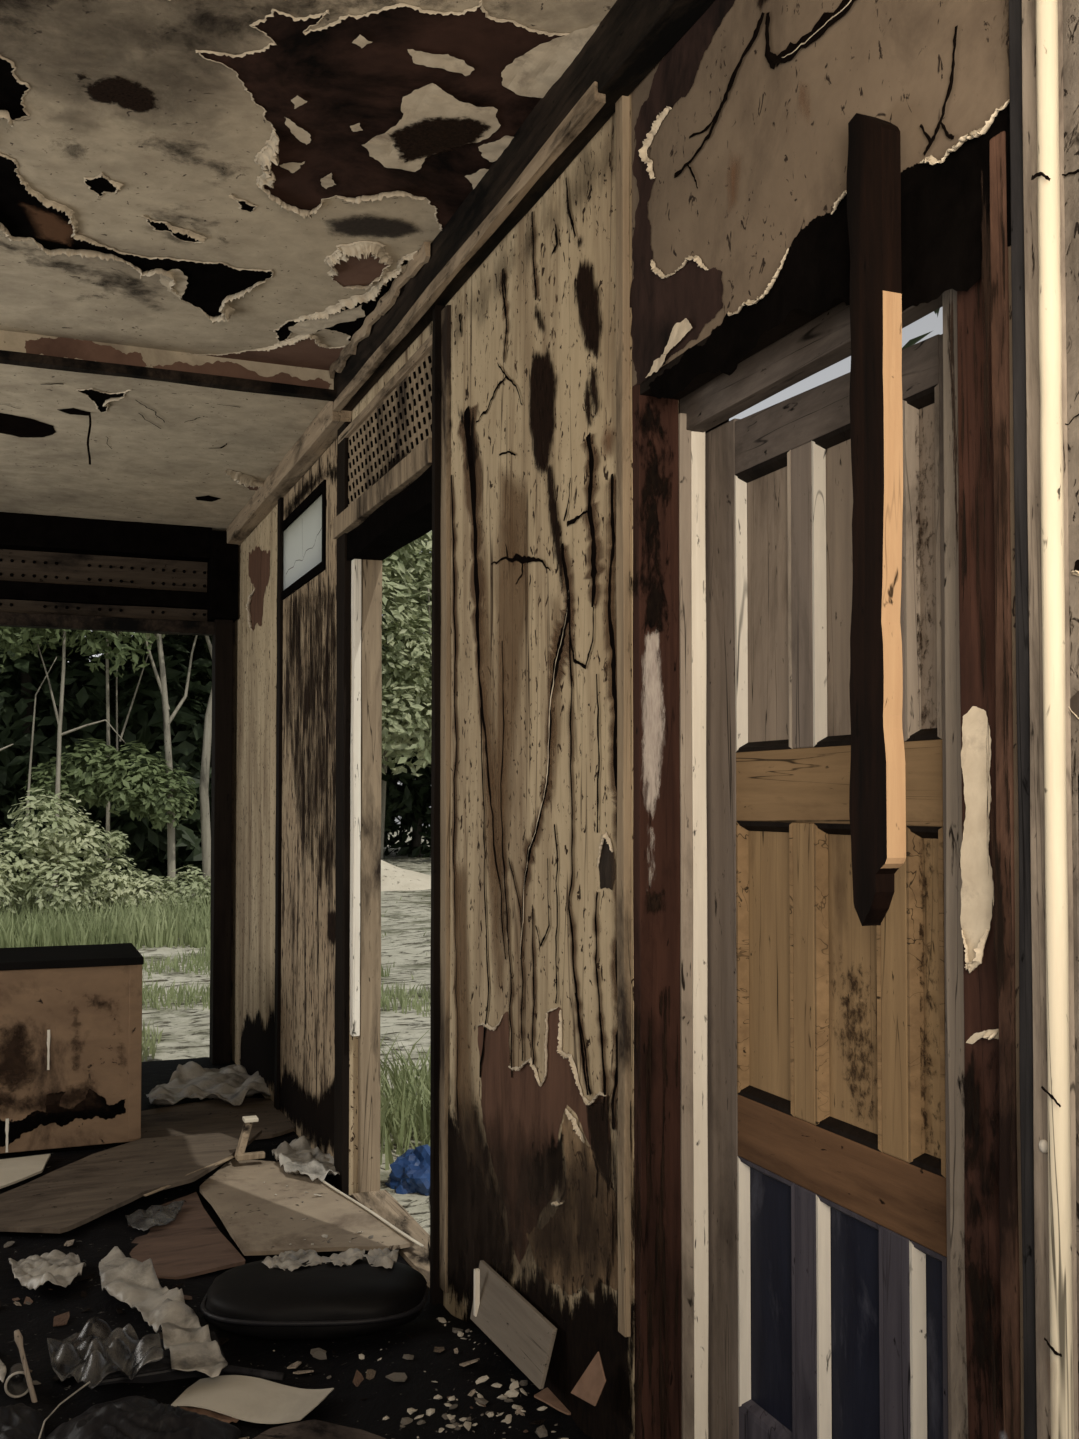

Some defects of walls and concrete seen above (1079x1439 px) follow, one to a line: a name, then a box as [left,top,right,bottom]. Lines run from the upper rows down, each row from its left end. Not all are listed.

peeling [0,153,274,324]
peeling [24,241,417,389]
peeling [195,0,600,231]
damp [589,368,602,412]
crack [674,12,765,189]
peeling [630,0,855,399]
crack [920,25,958,156]
peeling [901,99,1011,312]
crack [1031,169,1079,181]
damp [545,463,563,586]
damp [285,578,336,892]
damp [481,480,525,944]